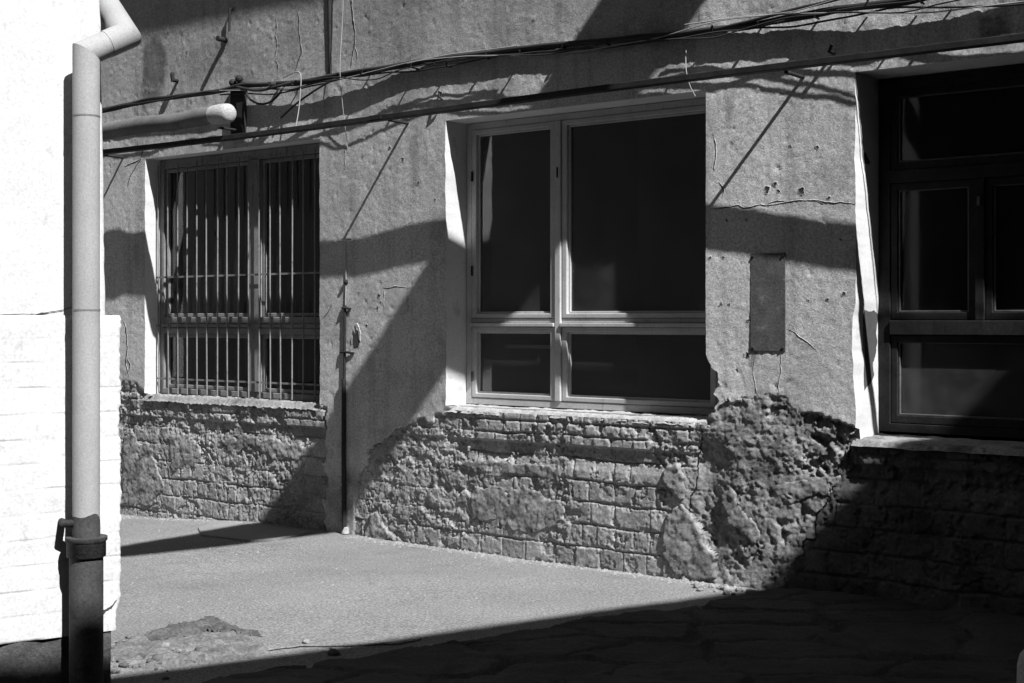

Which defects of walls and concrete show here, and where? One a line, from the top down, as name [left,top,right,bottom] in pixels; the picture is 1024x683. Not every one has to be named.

crack [710,134,854,209]
spalling [118,381,328,530]
spalling [355,391,1024,617]